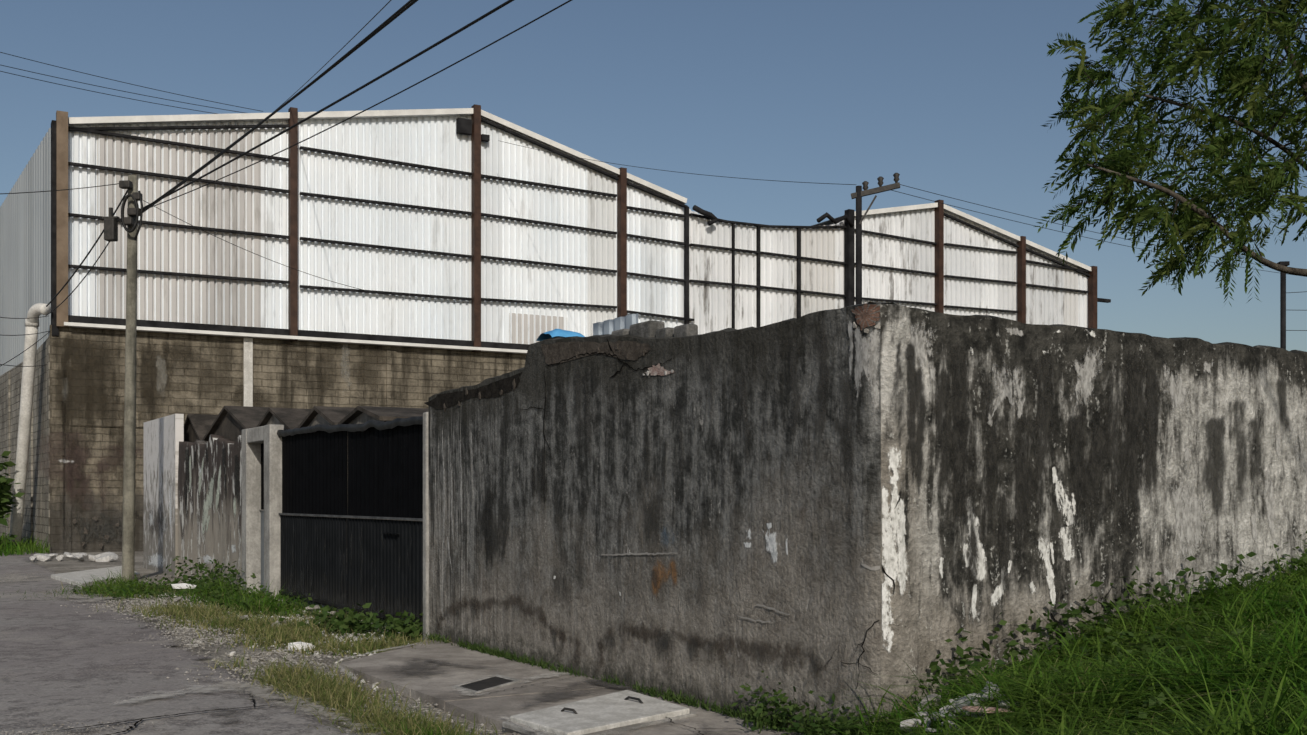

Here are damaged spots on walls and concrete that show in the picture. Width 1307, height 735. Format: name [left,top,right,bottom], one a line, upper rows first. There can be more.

crack [523,339,672,451]
spalling [643,363,674,376]
peeling [848,304,880,410]
damp [184,447,239,509]
damp [442,431,473,570]
damp [480,489,510,564]
damp [531,447,547,502]
peeling [744,523,788,563]
damp [882,343,1160,652]
damp [1203,379,1289,542]
damp [448,595,579,658]
crack [827,554,895,689]